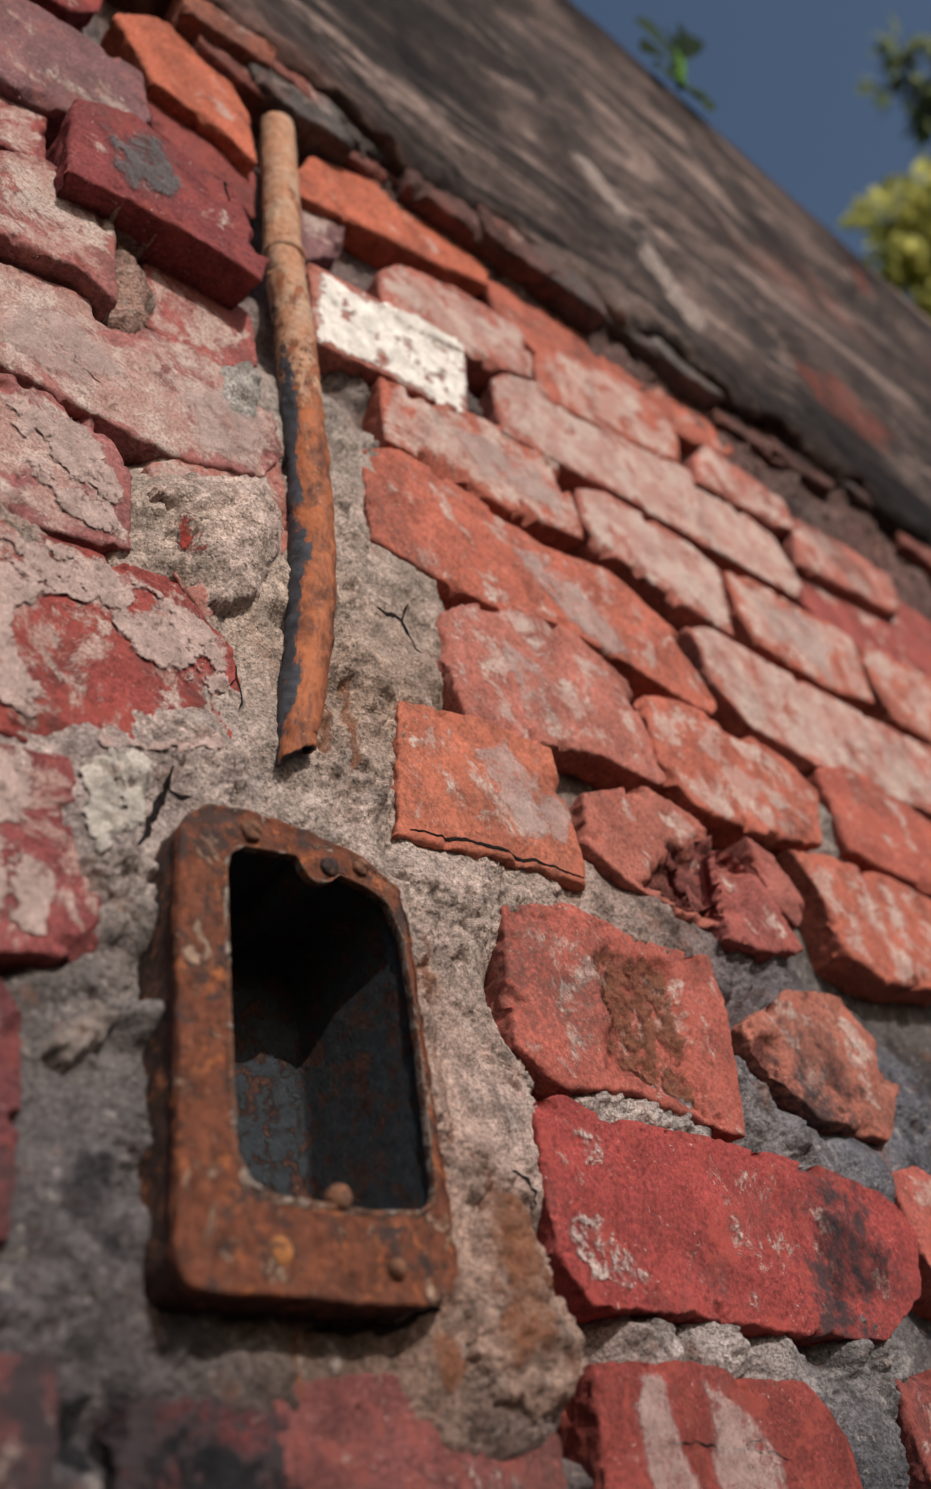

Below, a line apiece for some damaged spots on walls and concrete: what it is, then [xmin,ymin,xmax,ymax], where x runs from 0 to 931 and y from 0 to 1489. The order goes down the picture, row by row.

peeling [102,124,183,196]
peeling [317,273,467,413]
spalling [170,512,208,557]
peeling [0,532,229,719]
crack [376,604,422,653]
peeling [0,747,57,935]
crack [137,765,191,845]
crack [410,829,584,878]
spalling [643,835,804,964]
leakage [56,1394,94,1474]
leakage [139,1427,302,1489]